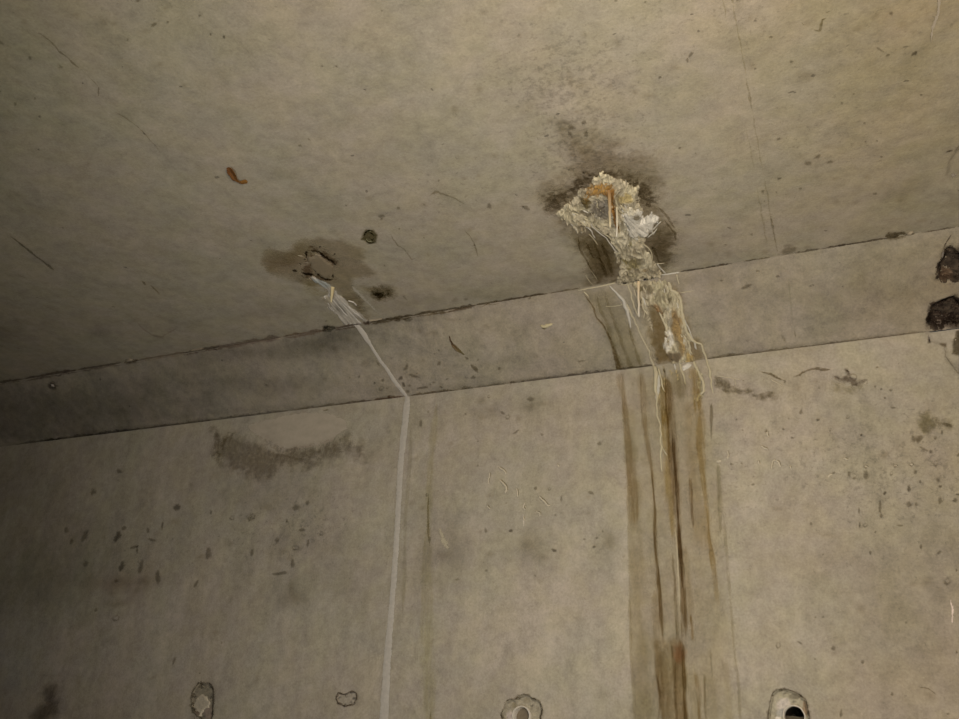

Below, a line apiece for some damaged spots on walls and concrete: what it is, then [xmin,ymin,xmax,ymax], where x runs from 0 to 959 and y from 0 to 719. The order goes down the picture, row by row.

leakage [556,171,714,471]